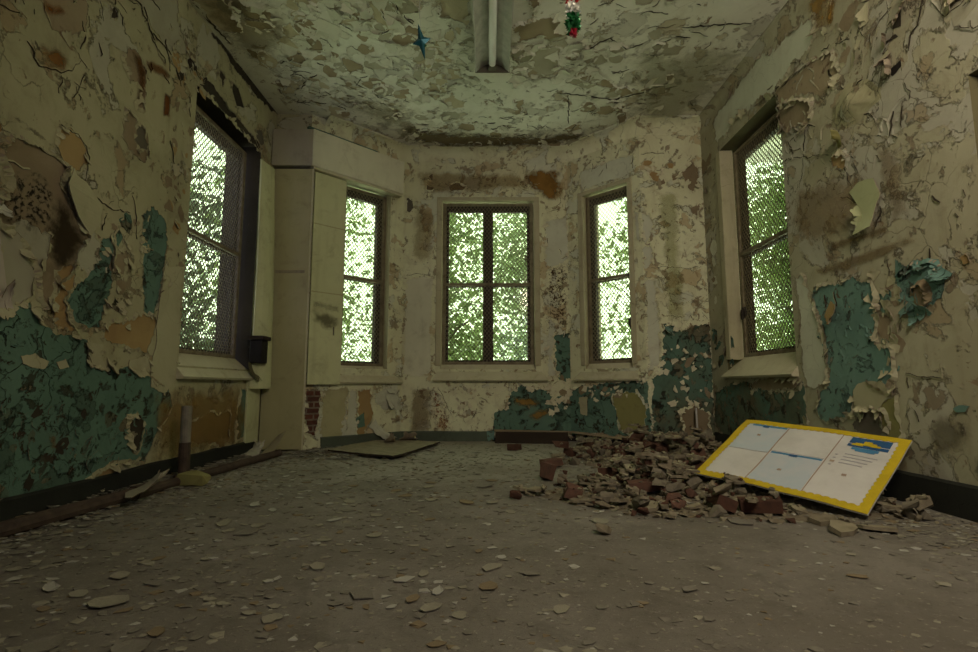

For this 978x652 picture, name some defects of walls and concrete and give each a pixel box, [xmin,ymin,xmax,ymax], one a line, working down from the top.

crack [27,0,138,101]
crack [144,37,201,117]
crack [192,0,231,44]
peeling [135,0,677,154]
peeling [712,0,869,143]
crack [767,0,918,227]
crack [907,0,978,51]
crack [61,124,153,297]
peeling [849,178,880,235]
peeling [0,96,197,500]
peeling [304,386,401,438]
peeling [489,258,953,443]